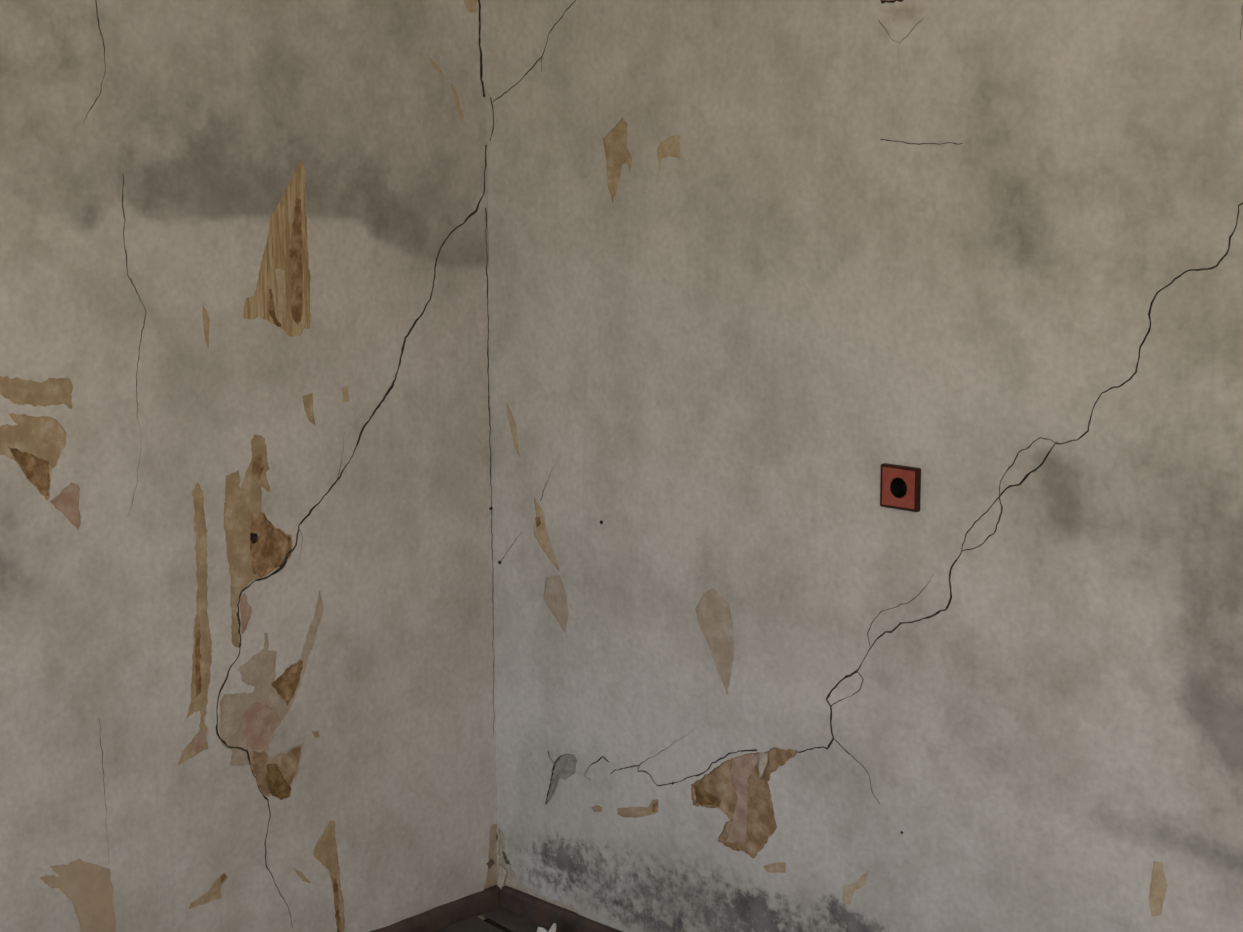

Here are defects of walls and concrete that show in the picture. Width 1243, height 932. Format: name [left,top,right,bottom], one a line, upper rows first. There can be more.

crack [880,138,962,146]
peeling [243,159,311,336]
peeling [0,376,81,530]
peeling [223,434,293,648]
crack [216,0,576,927]
crack [798,202,1243,804]
peeling [178,483,324,800]
peeling [313,820,345,932]
crack [584,729,757,786]
water stain [536,843,818,932]
spalling [691,747,798,873]
water stain [829,900,879,932]